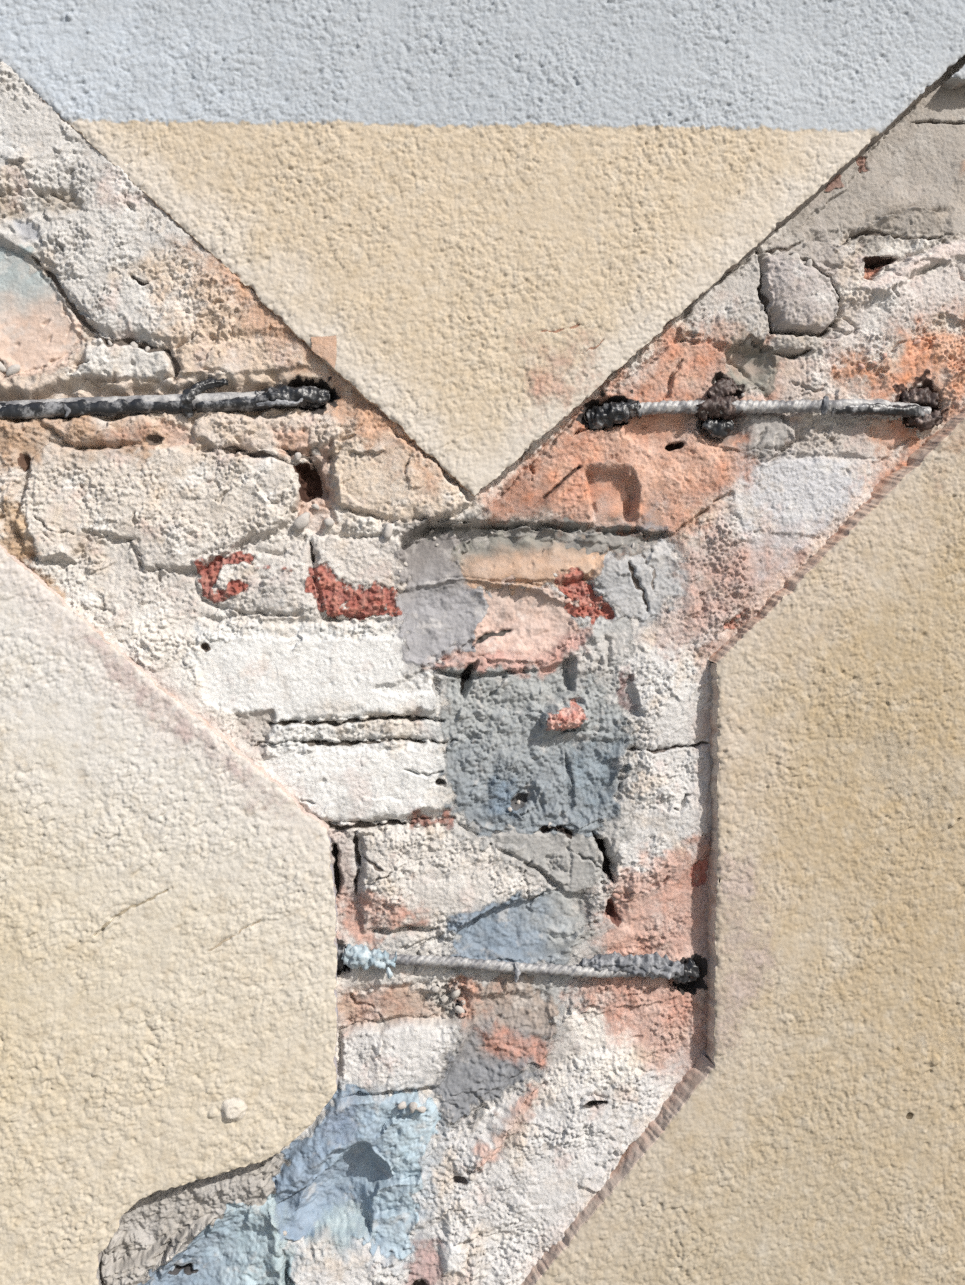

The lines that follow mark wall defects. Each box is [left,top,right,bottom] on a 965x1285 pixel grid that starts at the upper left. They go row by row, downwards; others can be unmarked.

crack [842,230,951,263]
crack [32,256,180,381]
crack [755,242,839,359]
spalling [311,335,337,369]
spalling [194,551,292,603]
spalling [305,564,402,620]
spalling [555,567,614,624]
crack [460,630,511,693]
crack [268,715,445,746]
spalling [546,699,586,731]
crack [539,826,613,880]
spalling [690,855,709,887]